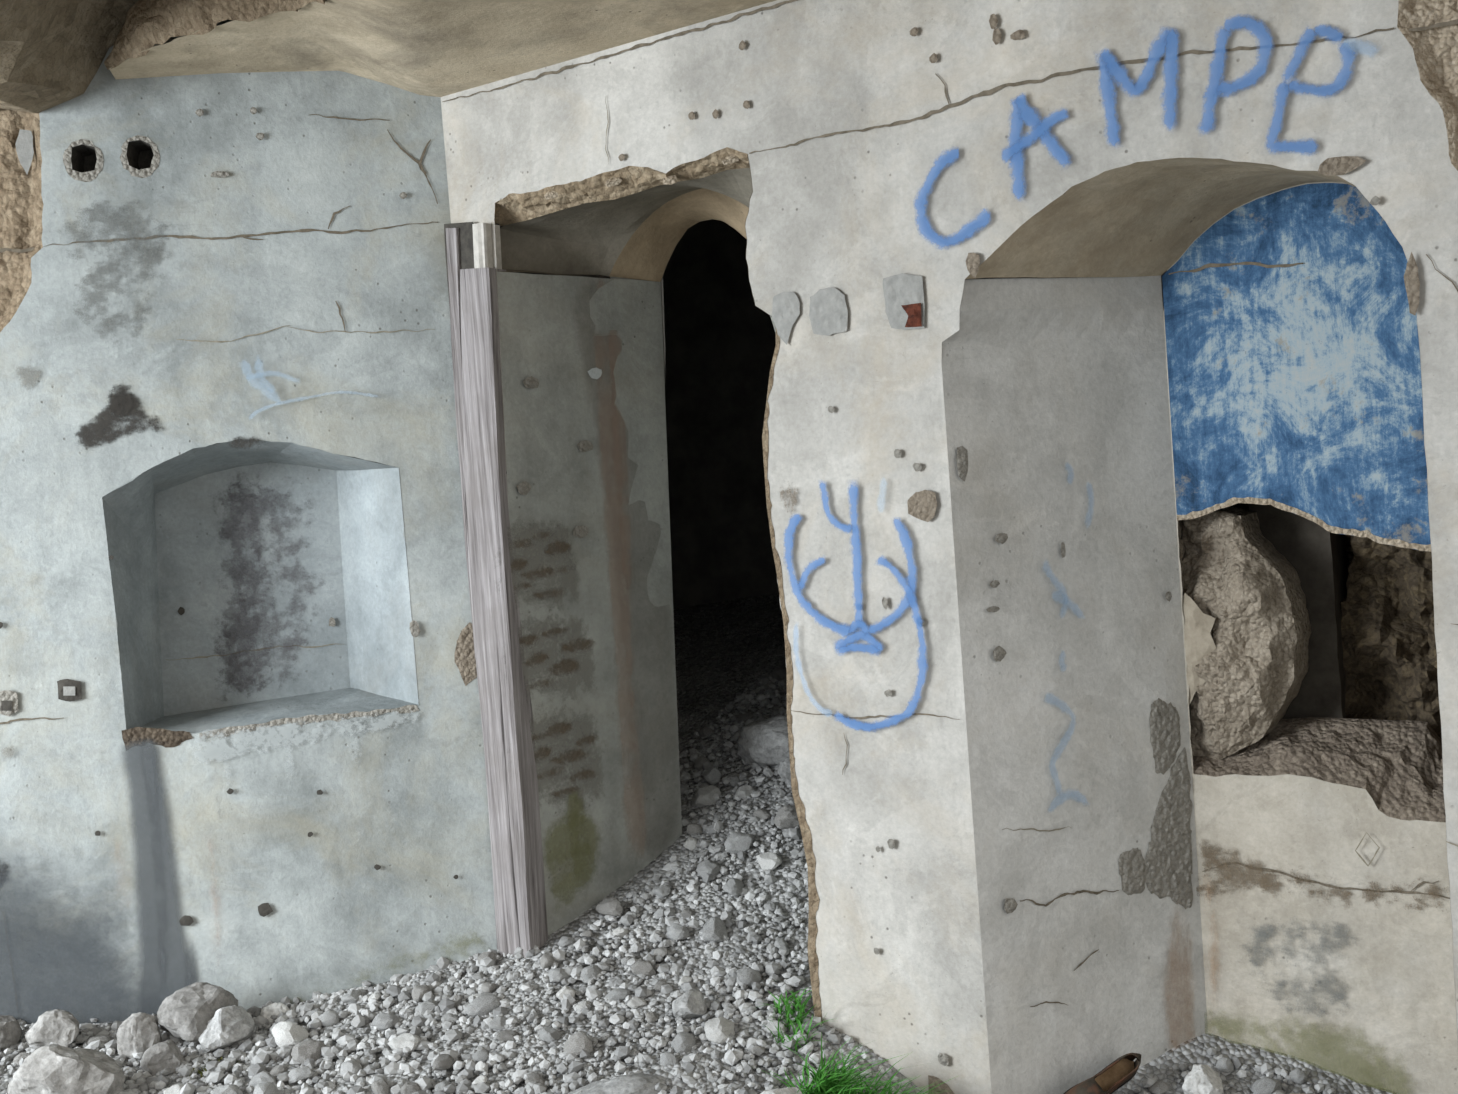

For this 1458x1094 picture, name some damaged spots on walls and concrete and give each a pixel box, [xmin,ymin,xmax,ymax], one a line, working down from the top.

crack [442,0,797,102]
crack [749,19,1458,154]
spalling [1397,0,1458,171]
spalling [0,109,44,332]
leakage [69,205,166,332]
crack [0,114,438,253]
leakage [217,484,312,694]
leakage [500,523,594,696]
spalling [1118,497,1446,910]
leakage [531,714,602,870]
crack [1020,890,1119,907]
crack [1030,949,1099,1007]